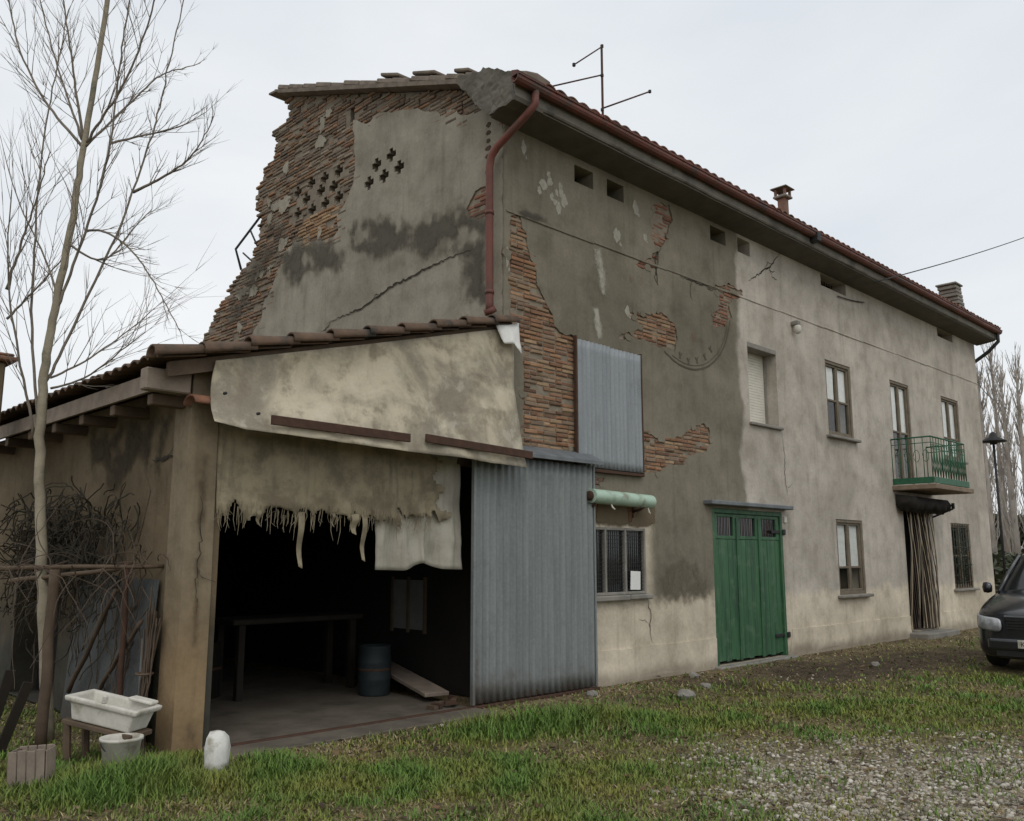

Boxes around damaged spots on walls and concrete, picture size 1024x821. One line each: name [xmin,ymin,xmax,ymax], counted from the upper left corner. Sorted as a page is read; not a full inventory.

flaking render [203,89,481,341]
water stain [230,210,486,322]
crack [323,250,470,331]
flaking render [501,215,579,452]
flaking render [619,305,676,350]
flaking render [633,200,672,272]
flaking render [711,284,742,328]
crack [749,255,779,281]
flaking render [644,423,714,478]